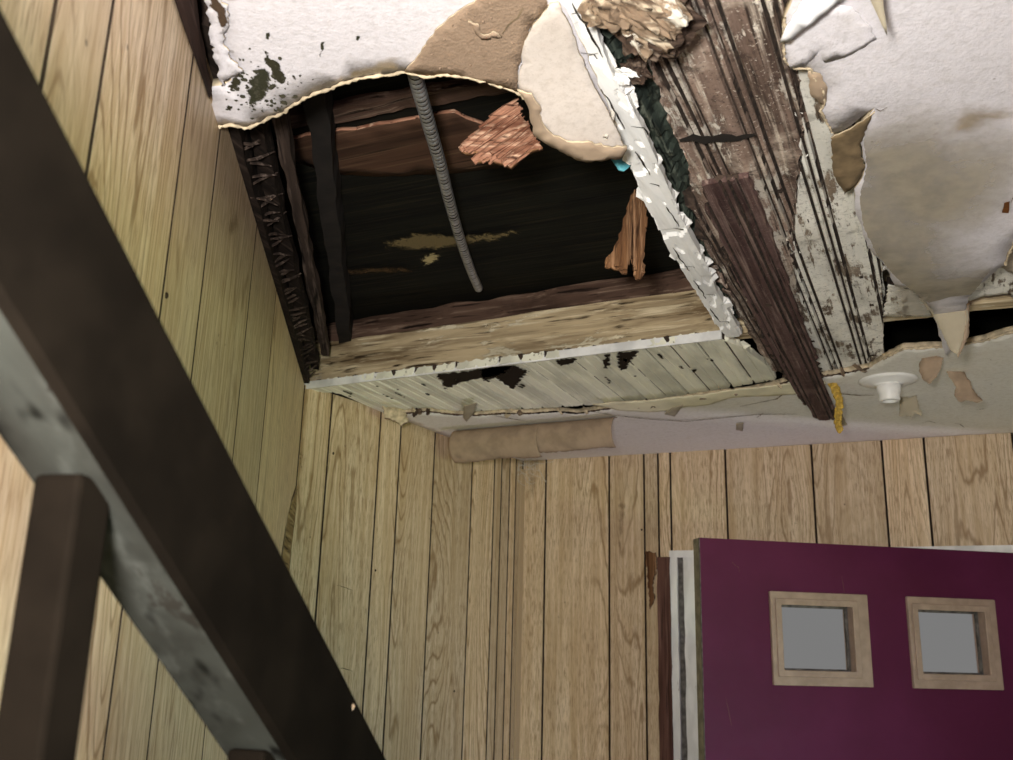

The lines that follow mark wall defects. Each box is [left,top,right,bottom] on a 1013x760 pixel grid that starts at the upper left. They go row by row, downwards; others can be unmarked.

peeling [870,0,887,35]
peeling [204,0,244,86]
peeling [405,0,548,92]
leakage [226,48,314,120]
leakage [860,139,996,303]
peeling [1001,249,1013,274]
peeling [480,365,530,389]
peeling [603,351,639,383]
spalling [820,364,869,385]
peeling [404,380,796,422]